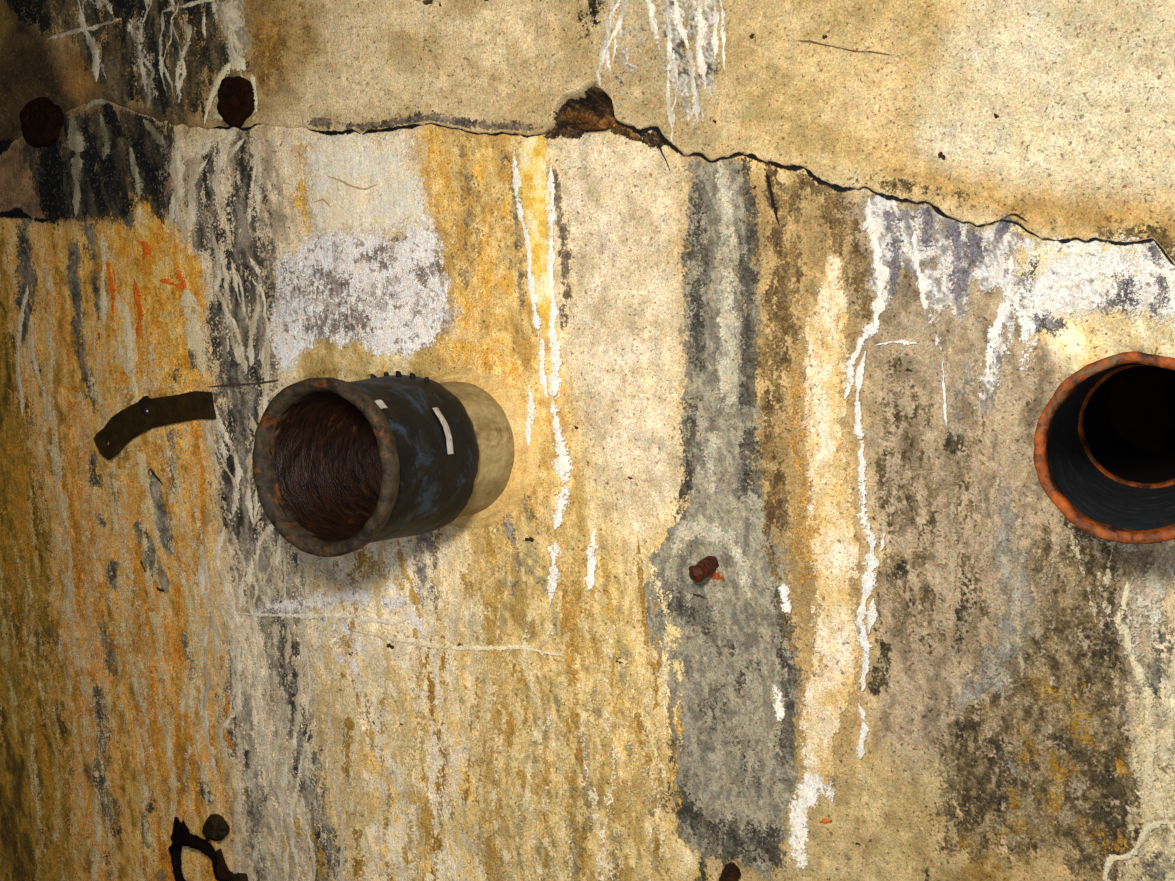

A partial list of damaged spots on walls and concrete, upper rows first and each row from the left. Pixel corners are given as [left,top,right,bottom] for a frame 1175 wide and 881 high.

crack [0,138,13,155]
crack [0,207,52,223]
crack [213,123,261,131]
crack [308,123,546,138]
crack [612,103,1175,266]
water stain [0,0,574,881]
water stain [574,0,1175,881]
rust [0,192,240,881]
water stain [545,706,595,881]